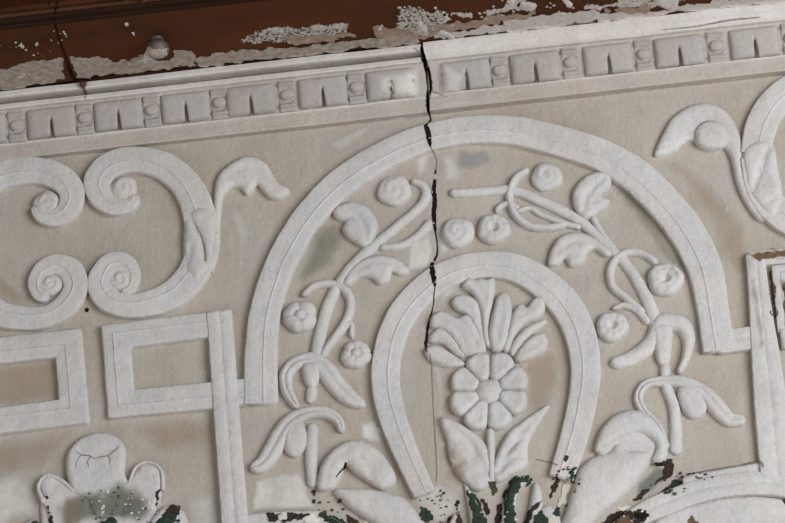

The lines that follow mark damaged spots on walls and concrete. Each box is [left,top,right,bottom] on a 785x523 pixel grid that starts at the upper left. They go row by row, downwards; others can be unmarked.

crack [0,1,377,92]
crack [400,44,447,482]
peeling [41,494,55,523]
water stain [66,486,144,517]
peeling [82,487,181,523]
peeling [266,490,369,523]
peeling [419,455,581,523]
peeling [602,459,714,523]